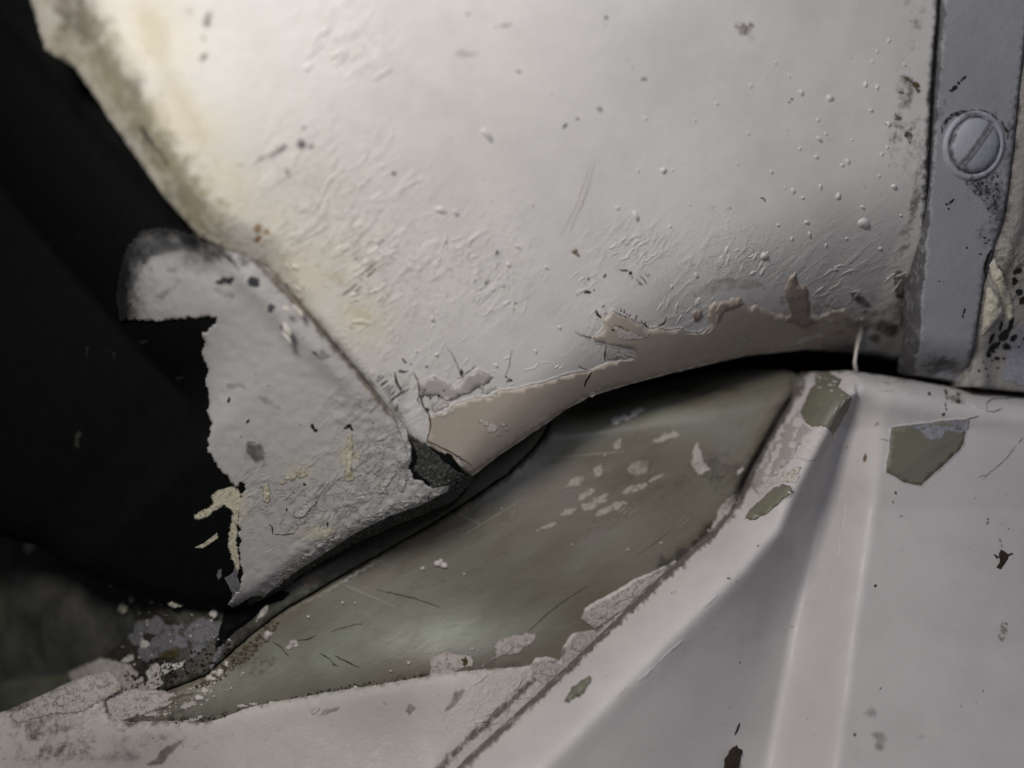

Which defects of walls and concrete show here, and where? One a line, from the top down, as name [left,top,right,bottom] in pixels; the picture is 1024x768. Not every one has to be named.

peeling [398,271,861,476]
spalling [743,372,852,521]
spalling [884,417,968,487]
peeling [195,533,218,549]
peeling [121,630,150,663]
peeling [179,644,229,710]
peeling [476,631,536,669]